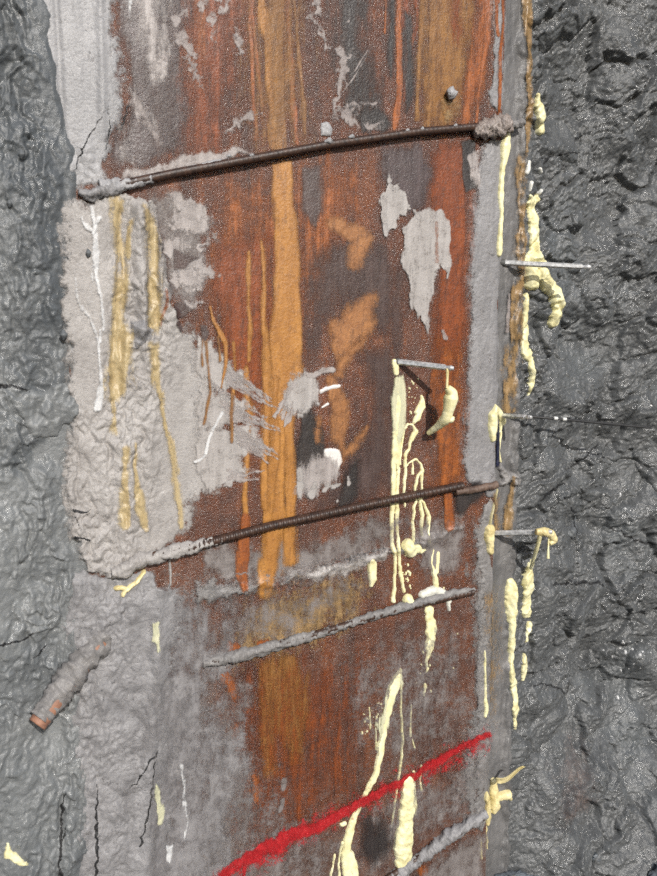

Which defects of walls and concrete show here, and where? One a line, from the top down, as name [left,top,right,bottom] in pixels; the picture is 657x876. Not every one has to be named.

rust [185,0,306,153]
rust [384,0,505,130]
spalling [98,123,479,194]
rust [430,142,473,532]
rust [201,161,377,829]
crack [58,791,67,876]
crack [92,784,100,876]
crack [129,751,158,847]